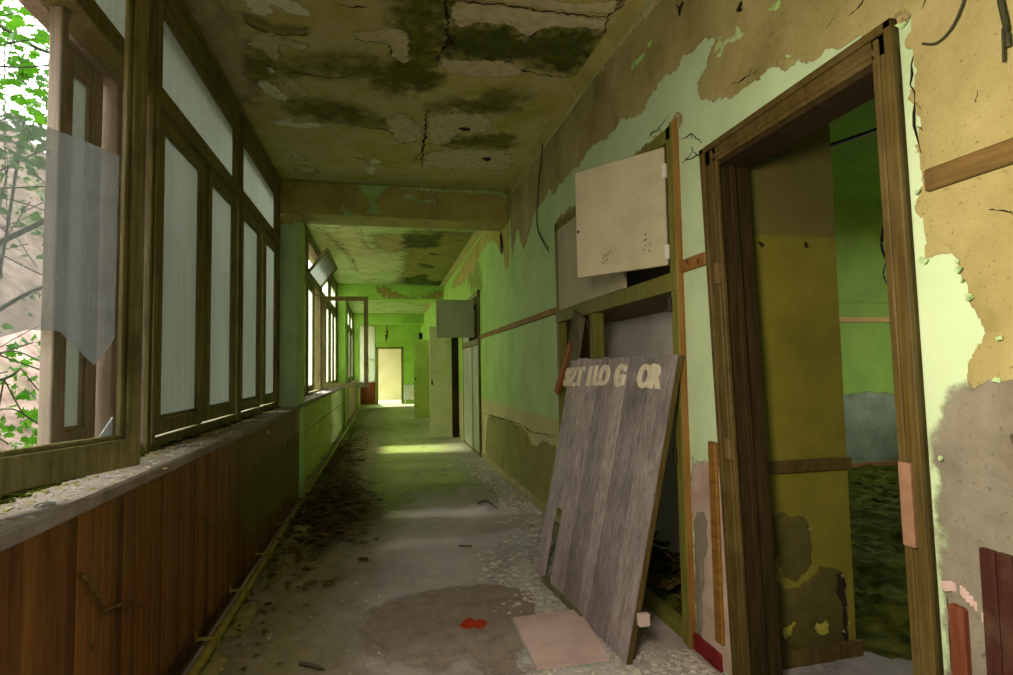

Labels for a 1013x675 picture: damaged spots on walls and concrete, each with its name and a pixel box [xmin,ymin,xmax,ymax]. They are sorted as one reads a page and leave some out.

peeling [241,0,312,17]
water stain [185,0,603,104]
crack [436,0,625,66]
crack [360,112,428,167]
flaking render [351,0,1013,389]
peeling [316,225,407,274]
flaking render [486,414,561,516]
water stain [218,407,491,675]
water stain [359,525,680,675]
water stain [693,512,708,636]
flaking render [772,512,852,650]
water stain [810,648,913,675]